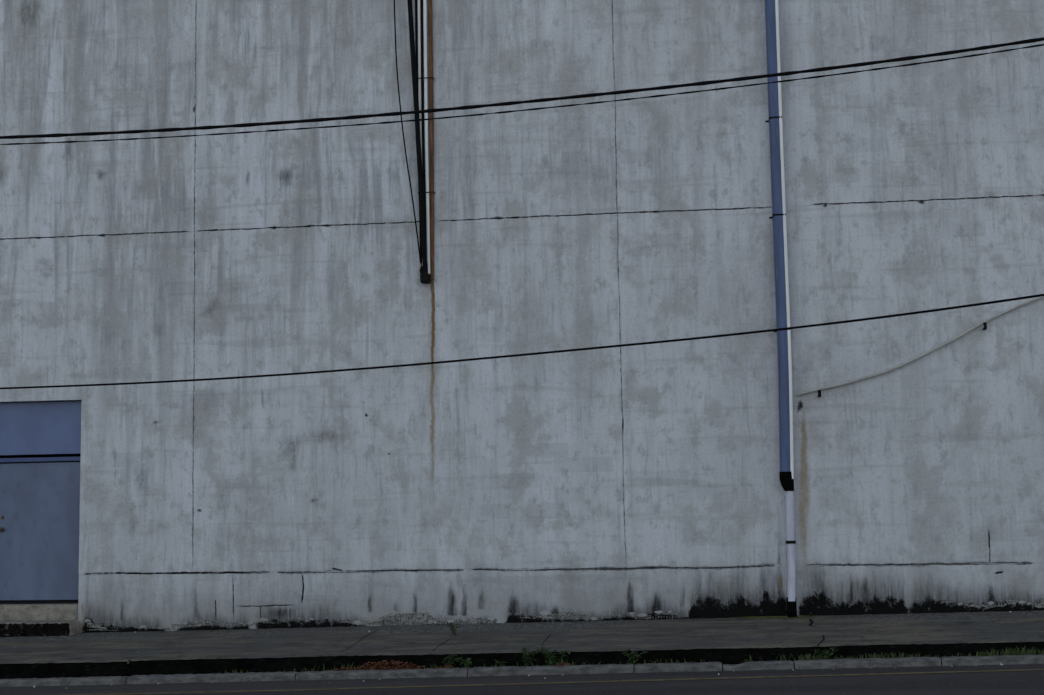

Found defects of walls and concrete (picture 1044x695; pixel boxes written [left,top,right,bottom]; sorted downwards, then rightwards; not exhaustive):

leakage [384,592,486,626]
leakage [506,579,1044,623]